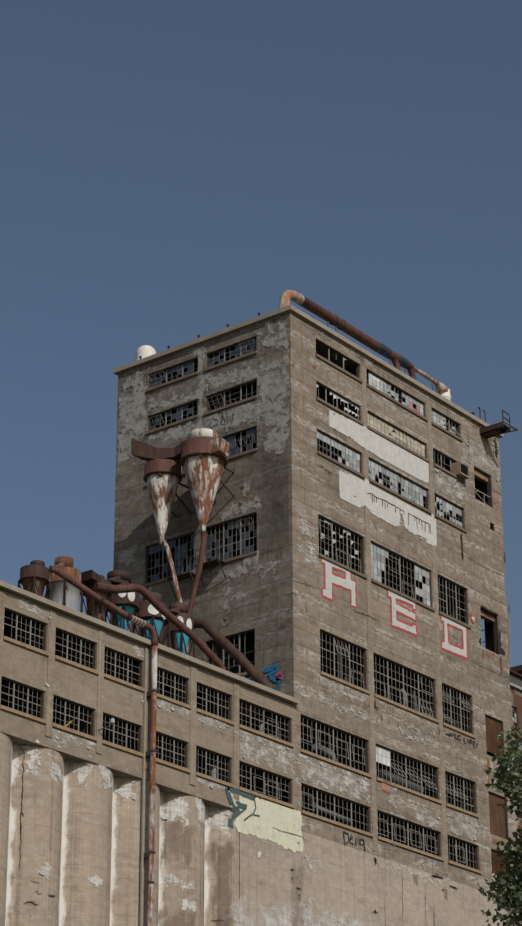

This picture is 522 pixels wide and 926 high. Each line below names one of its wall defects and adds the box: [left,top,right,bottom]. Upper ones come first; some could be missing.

peeling [329,410,466,503]
peeling [339,468,437,546]
peeling [161,778,324,873]
peeling [415,809,481,849]
peeling [161,873,196,912]
peeling [234,898,292,926]
peeling [374,857,458,890]